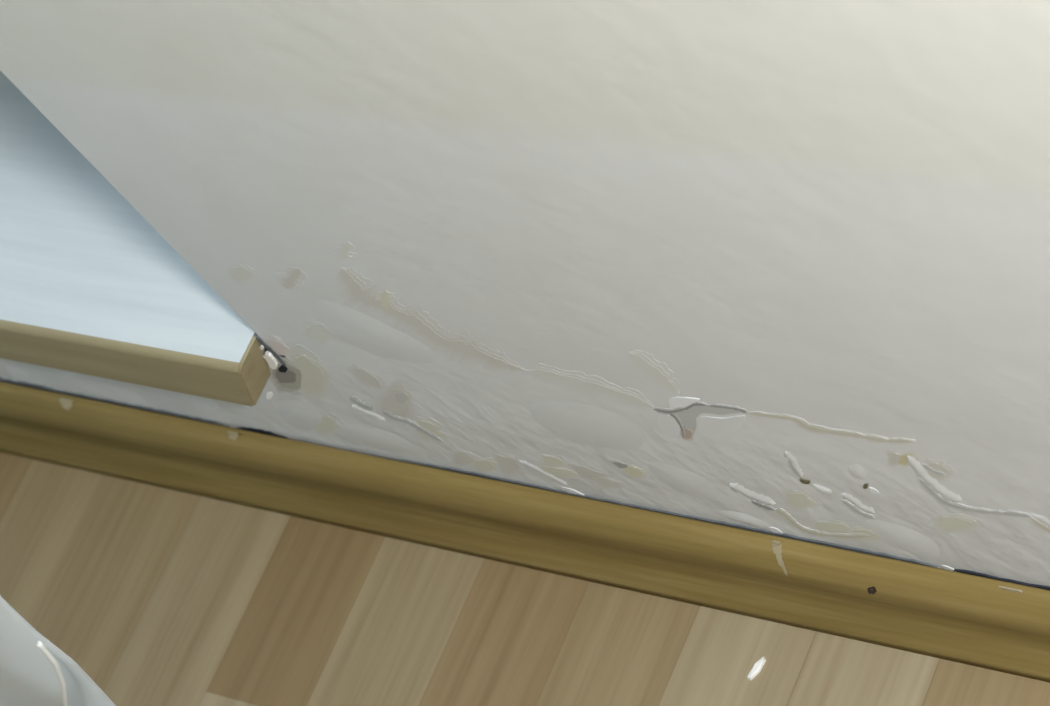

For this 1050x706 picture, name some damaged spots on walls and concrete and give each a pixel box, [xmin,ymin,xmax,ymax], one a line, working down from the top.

crack [0,377,1050,590]
peeling [657,397,741,437]